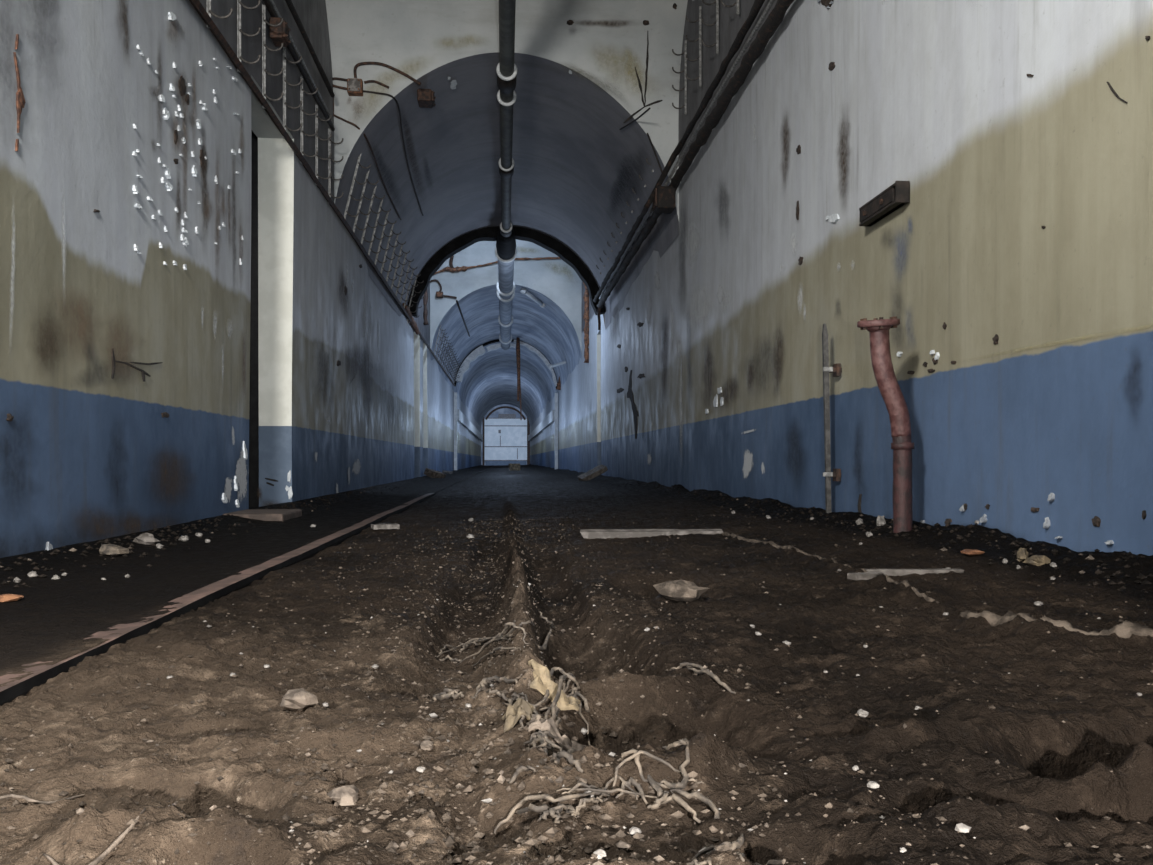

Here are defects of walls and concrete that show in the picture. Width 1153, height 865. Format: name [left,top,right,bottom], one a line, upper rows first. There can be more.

peeling [157,62,218,204]
peeling [132,175,199,270]
peeling [222,426,249,507]